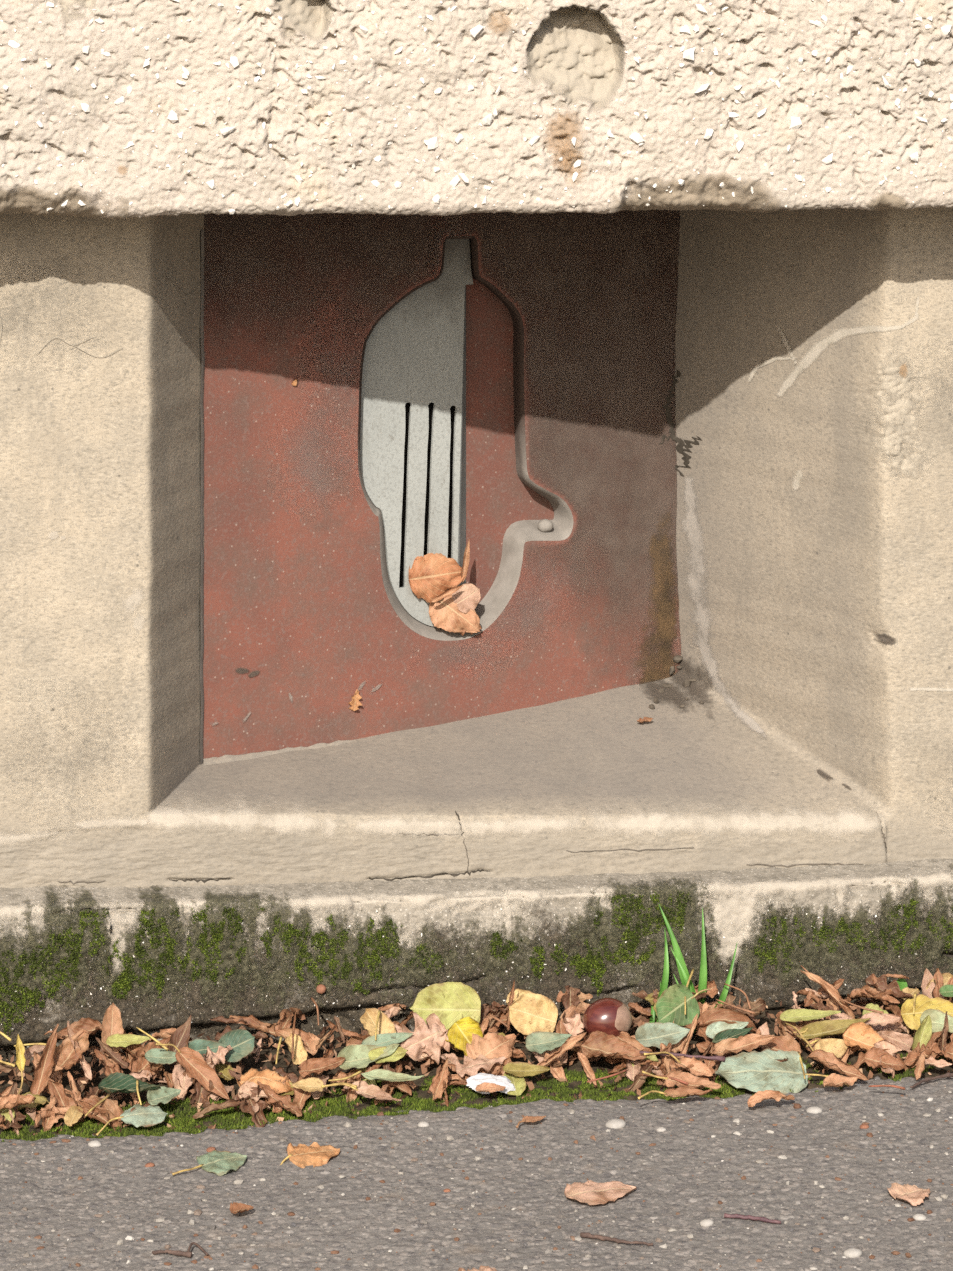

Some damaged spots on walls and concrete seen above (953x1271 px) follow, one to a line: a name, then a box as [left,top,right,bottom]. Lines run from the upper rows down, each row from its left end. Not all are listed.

spalling [0,0,115,88]
spalling [0,138,133,219]
spalling [91,35,183,105]
spalling [124,59,236,214]
spalling [212,29,249,75]
spalling [228,0,663,211]
spalling [664,2,730,74]
spalling [608,72,807,212]
spalling [849,14,953,211]
crack [369,811,491,881]
leakage [0,866,953,1063]